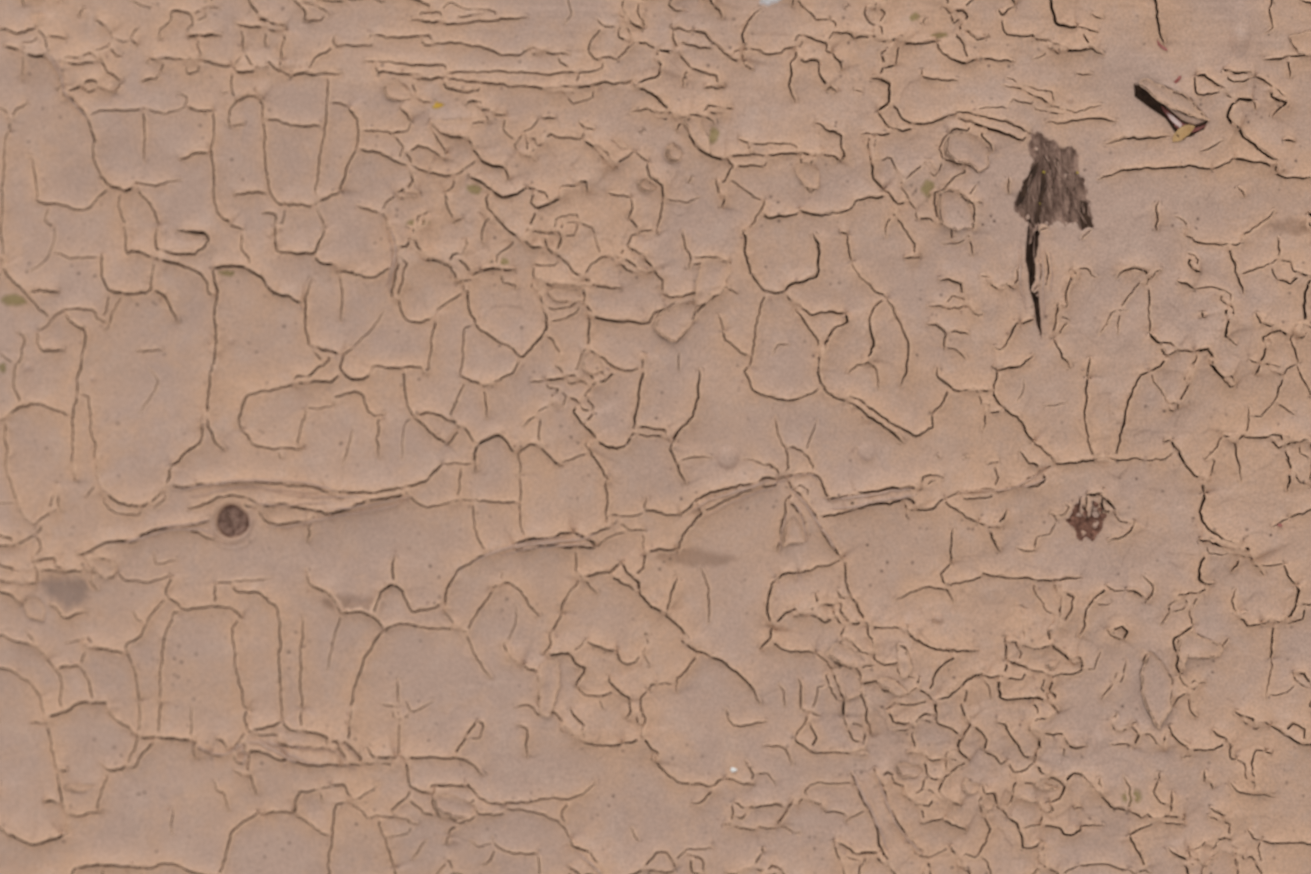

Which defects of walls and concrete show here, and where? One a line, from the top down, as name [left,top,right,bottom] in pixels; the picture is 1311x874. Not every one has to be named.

crack [0,0,1172,468]
peeling [855,25,1094,244]
crack [1095,138,1236,182]
peeling [1139,78,1282,175]
crack [1235,185,1248,199]
crack [1190,0,1311,184]
crack [0,228,846,874]
crack [844,200,1311,874]
crack [628,554,958,874]